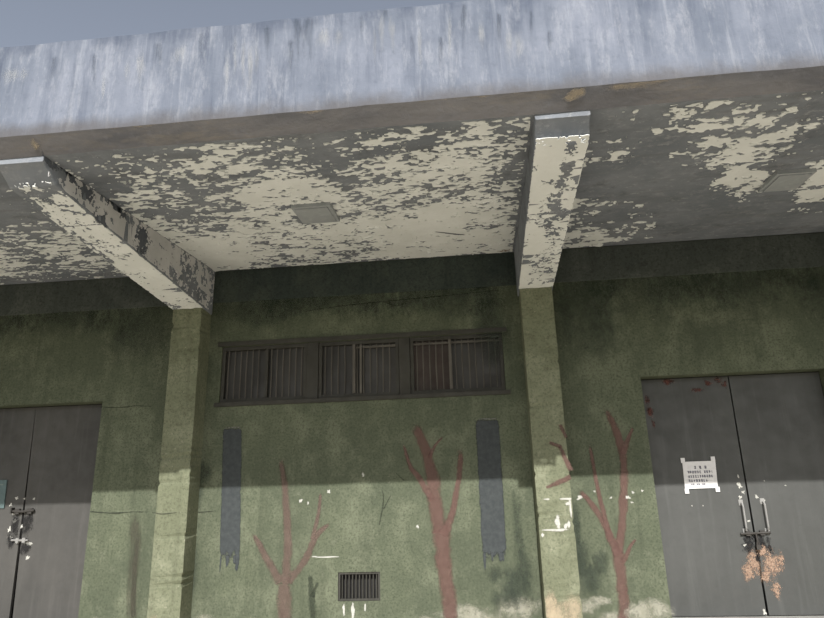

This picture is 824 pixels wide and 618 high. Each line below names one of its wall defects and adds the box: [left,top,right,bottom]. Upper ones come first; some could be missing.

peeling [651,95,824,202]
peeling [0,117,656,309]
peeling [787,150,824,213]
crack [90,509,177,517]
corrosion [742,545,785,598]